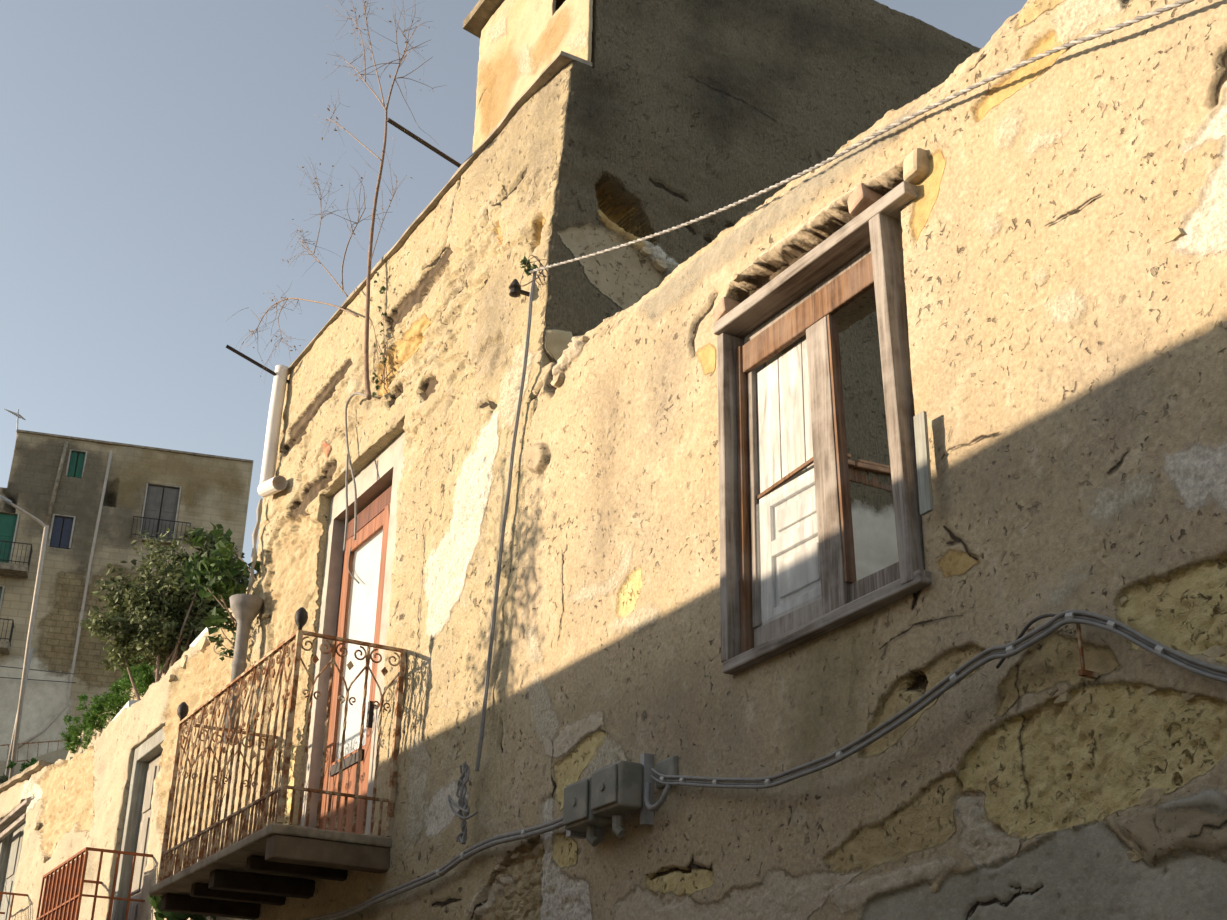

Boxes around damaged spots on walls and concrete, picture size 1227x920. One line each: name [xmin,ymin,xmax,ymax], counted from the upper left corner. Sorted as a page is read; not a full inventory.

spalling [1014,0,1064,28]
flaking render [973,30,1067,122]
flaking render [1165,81,1227,256]
flaking render [533,217,546,247]
flaking render [557,183,679,322]
flaking render [376,314,432,408]
spalling [419,376,438,401]
crack [557,554,565,639]
flaking render [565,546,658,633]
flaking render [1116,554,1227,663]
flaking render [614,632,1227,920]